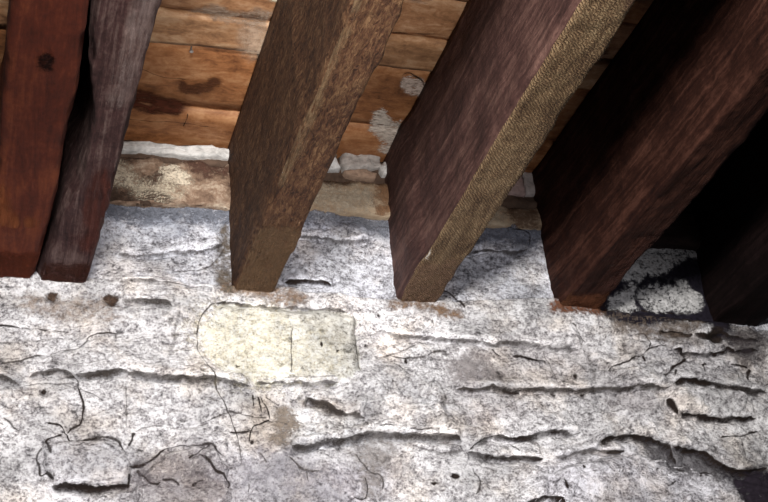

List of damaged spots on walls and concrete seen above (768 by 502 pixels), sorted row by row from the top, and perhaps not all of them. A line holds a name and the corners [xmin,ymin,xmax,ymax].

leakage [132,77,221,115]
leakage [370,110,401,153]
spalling [103,294,119,306]
crack [0,324,119,364]
crack [127,298,277,492]
crack [36,376,135,480]
crack [289,456,319,479]
spalling [644,434,768,502]